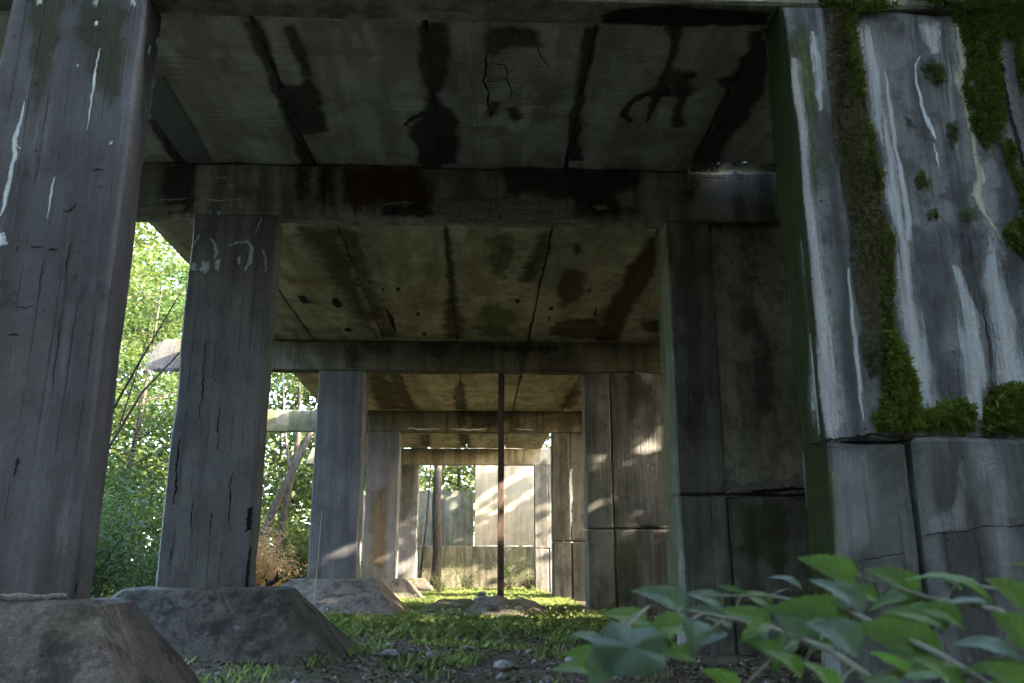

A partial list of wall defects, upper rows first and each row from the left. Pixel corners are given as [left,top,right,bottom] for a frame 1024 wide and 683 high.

water stain [0,0,62,216]
water stain [244,21,328,164]
crack [482,51,512,117]
water stain [914,24,940,169]
water stain [858,28,931,404]
water stain [955,27,1024,384]
crack [168,438,233,566]
crack [199,340,220,452]
crack [723,487,806,500]
crack [809,433,907,446]
water stain [952,266,986,419]
crack [924,525,1024,536]